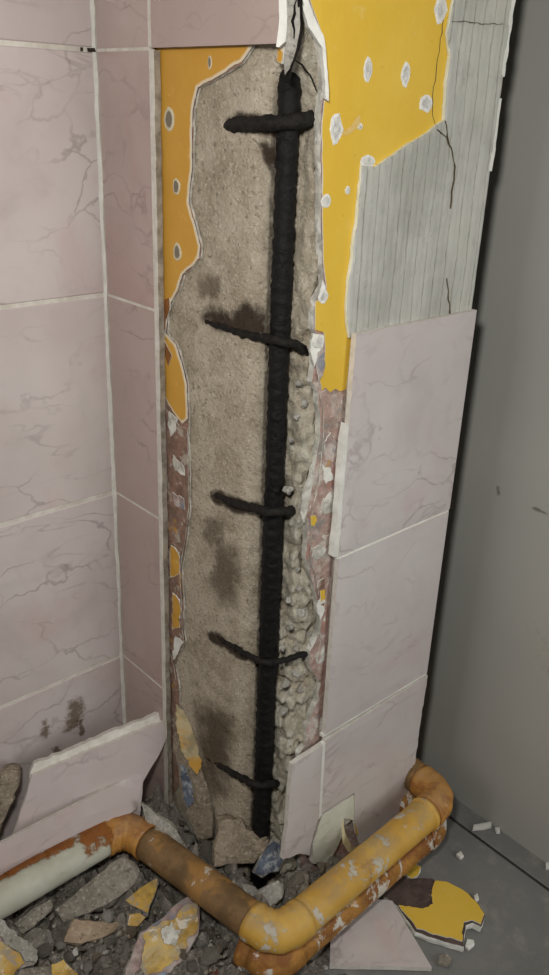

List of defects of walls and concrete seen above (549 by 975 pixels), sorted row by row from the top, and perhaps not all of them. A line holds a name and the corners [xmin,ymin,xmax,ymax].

peeling [434,0,448,25]
peeling [363,56,373,82]
peeling [401,62,410,88]
peeling [419,95,433,113]
crack [432,20,504,209]
peeling [360,155,375,166]
spalling [164,0,345,845]
spalling [237,855,298,895]